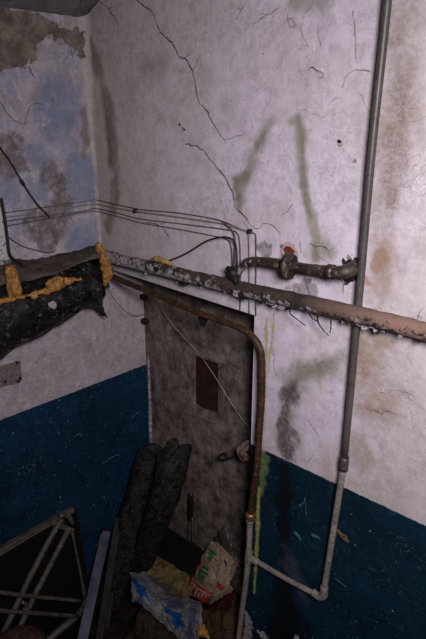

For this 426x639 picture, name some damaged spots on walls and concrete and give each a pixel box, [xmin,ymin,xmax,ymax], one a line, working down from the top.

peeling [0,6,86,73]
crack [137,0,244,139]
crack [187,143,280,233]